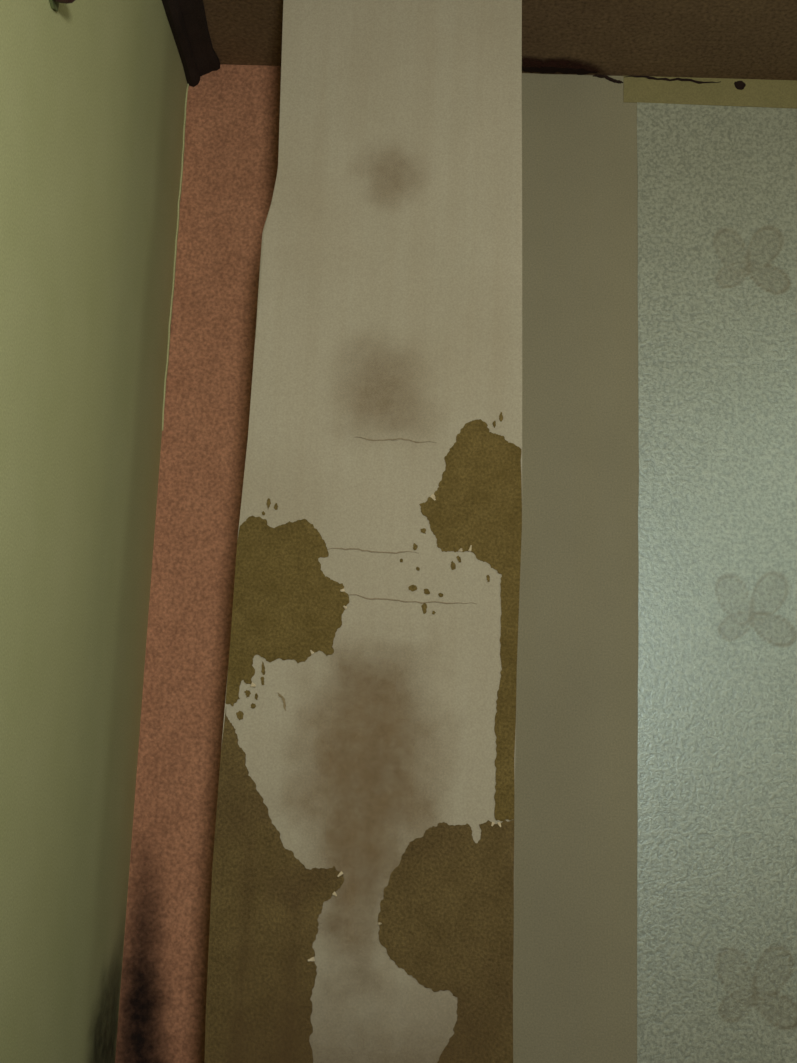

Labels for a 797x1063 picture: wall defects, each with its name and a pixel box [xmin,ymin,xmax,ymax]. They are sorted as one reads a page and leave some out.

crack [522,58,721,84]
crack [359,436,436,444]
flaking render [115,64,281,1063]
peeling [491,553,521,827]
peeling [437,967,513,1063]